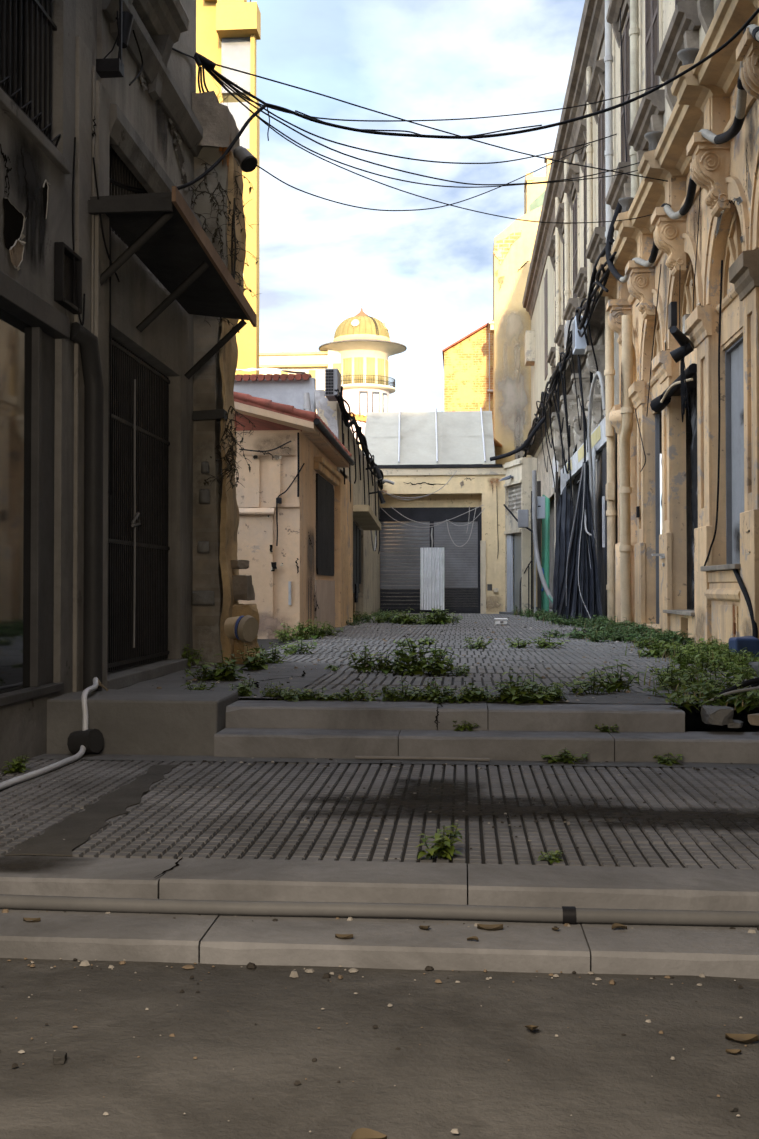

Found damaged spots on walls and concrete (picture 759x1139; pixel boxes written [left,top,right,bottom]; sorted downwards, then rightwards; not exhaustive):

crack [154,857,183,878]